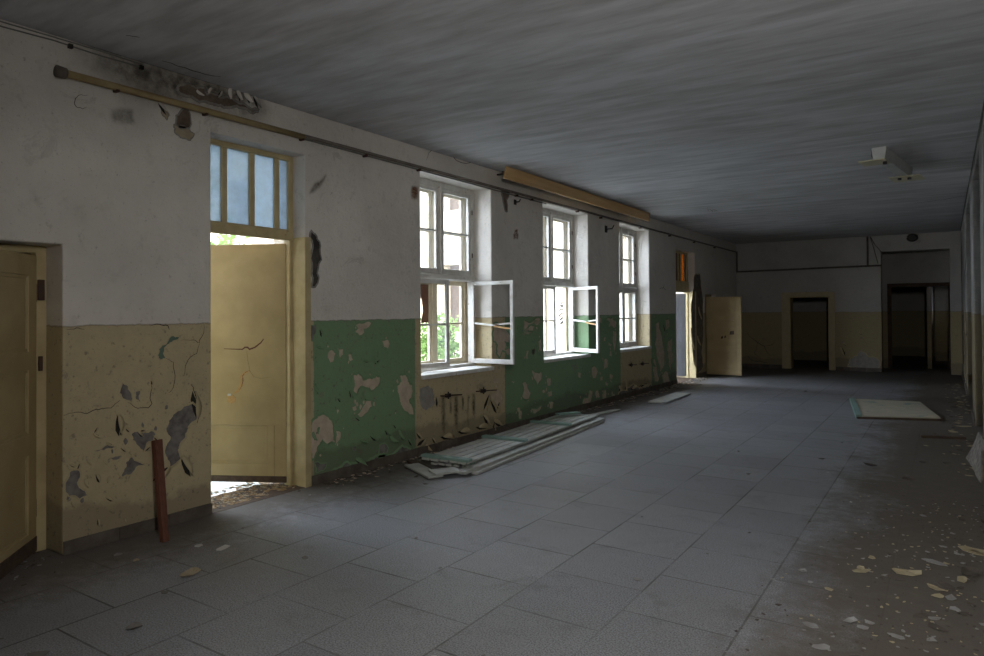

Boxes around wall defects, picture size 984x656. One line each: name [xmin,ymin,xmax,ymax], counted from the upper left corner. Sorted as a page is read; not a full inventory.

spalling [158,82,262,141]
spalling [309,230,322,288]
peeling [63,391,202,508]
crack [64,333,204,423]
crack [224,339,269,390]
spalling [311,324,390,461]
peeling [393,371,419,417]
peeling [417,377,503,451]
peeling [492,317,510,358]
peeling [511,313,554,420]
peeling [578,317,617,404]